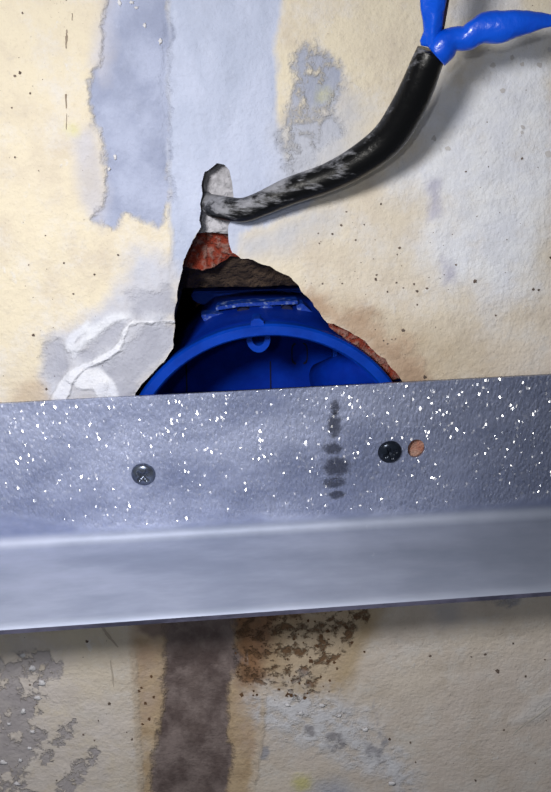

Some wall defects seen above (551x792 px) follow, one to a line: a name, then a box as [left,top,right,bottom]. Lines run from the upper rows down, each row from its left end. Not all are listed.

peeling [54,0,191,249]
spalling [201,163,234,197]
peeling [174,180,365,329]
peeling [246,21,392,193]
spalling [328,323,403,382]
spalling [408,439,424,456]
peeling [0,629,133,792]
peeling [138,675,170,792]
damp [116,617,274,792]